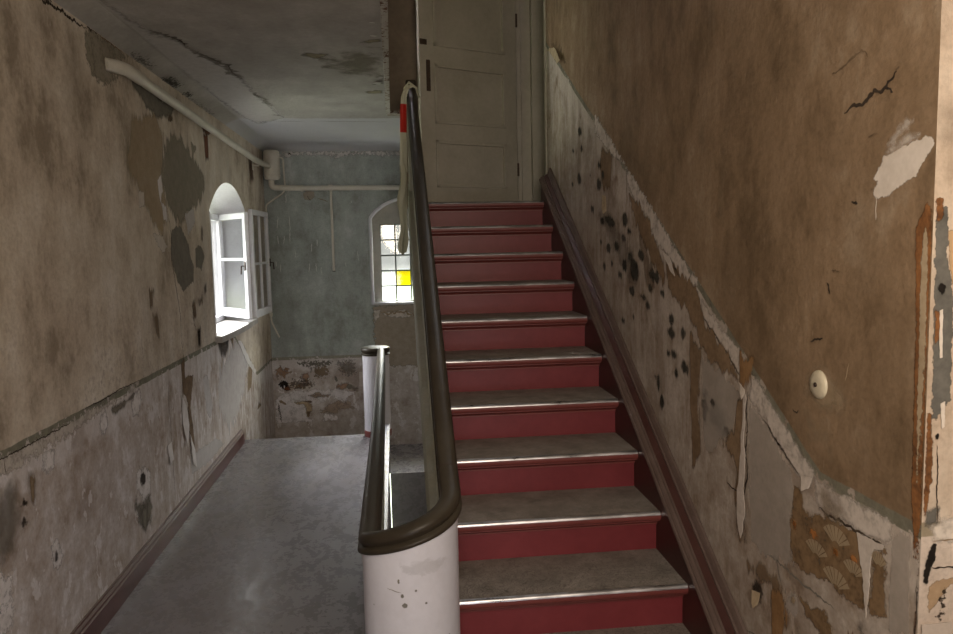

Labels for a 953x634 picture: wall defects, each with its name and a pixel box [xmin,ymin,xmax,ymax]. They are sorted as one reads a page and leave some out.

crack [147,29,281,116]
peeling [127,113,167,253]
peeling [594,114,698,285]
damp [591,206,664,308]
flaking render [192,286,206,344]
damp [667,314,688,377]
peeling [0,381,139,475]
peeling [191,341,256,473]
peeling [275,380,357,423]
peeling [701,300,892,547]
flaking render [931,519,953,542]